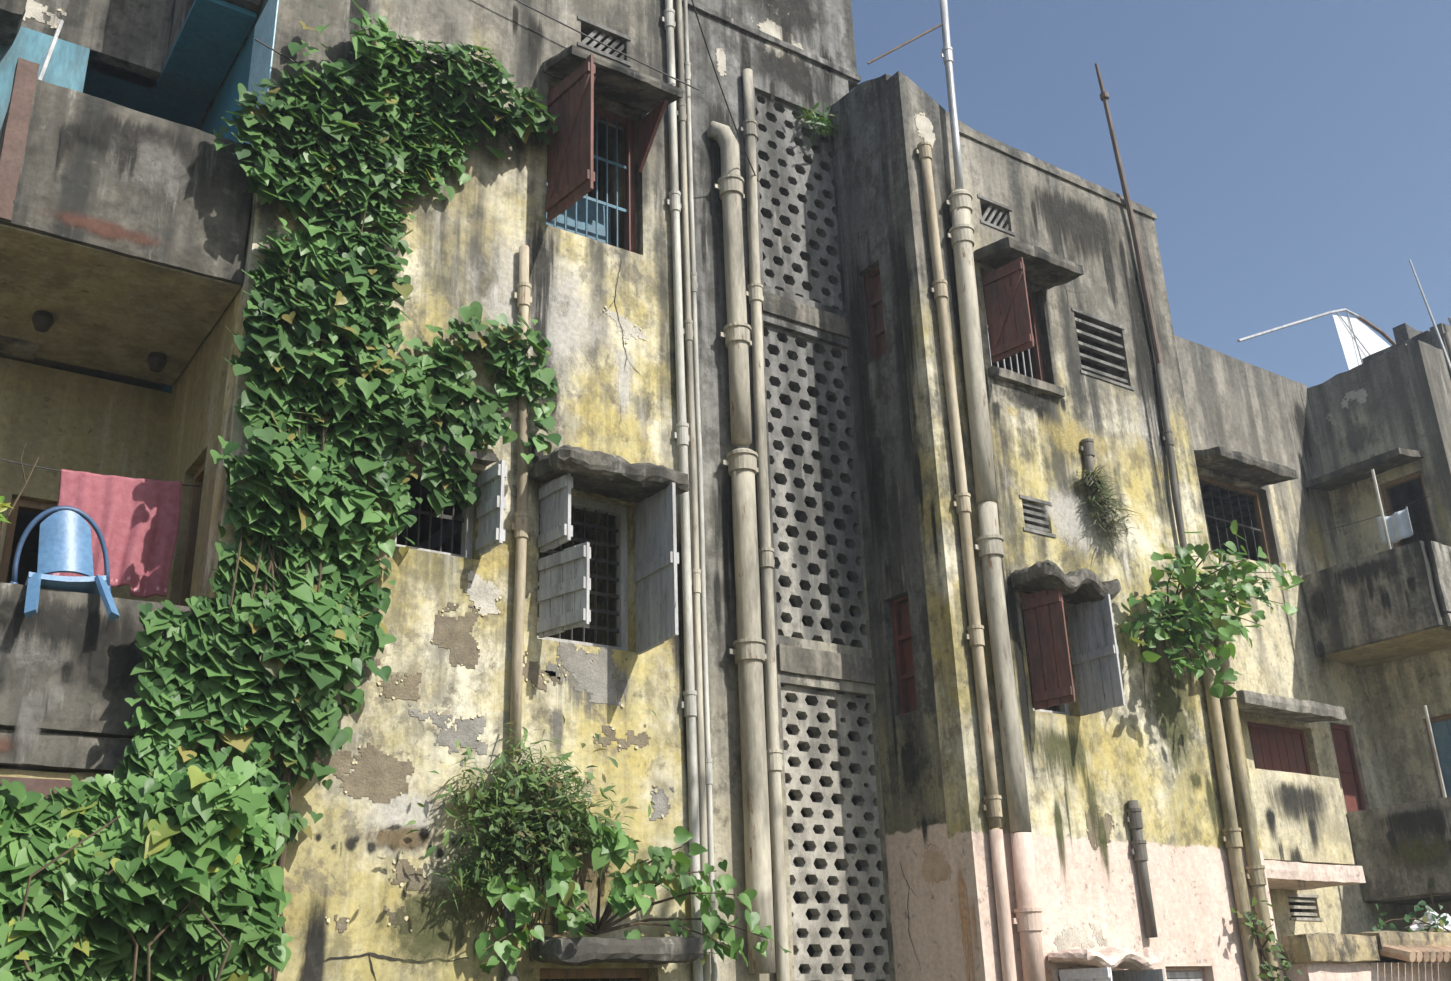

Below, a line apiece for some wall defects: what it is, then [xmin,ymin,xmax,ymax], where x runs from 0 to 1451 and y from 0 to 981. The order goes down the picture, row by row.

peeling [23,0,66,29]
peeling [751,2,803,62]
leakage [941,181,963,365]
leakage [1031,190,1183,517]
efflorescence [1047,493,1109,550]
peeling [431,571,502,669]
peeling [362,659,488,766]
flaking render [523,642,628,708]
leakage [1001,559,1109,873]
peeling [314,742,415,804]
leakage [1267,782,1324,885]
crack [323,952,470,980]